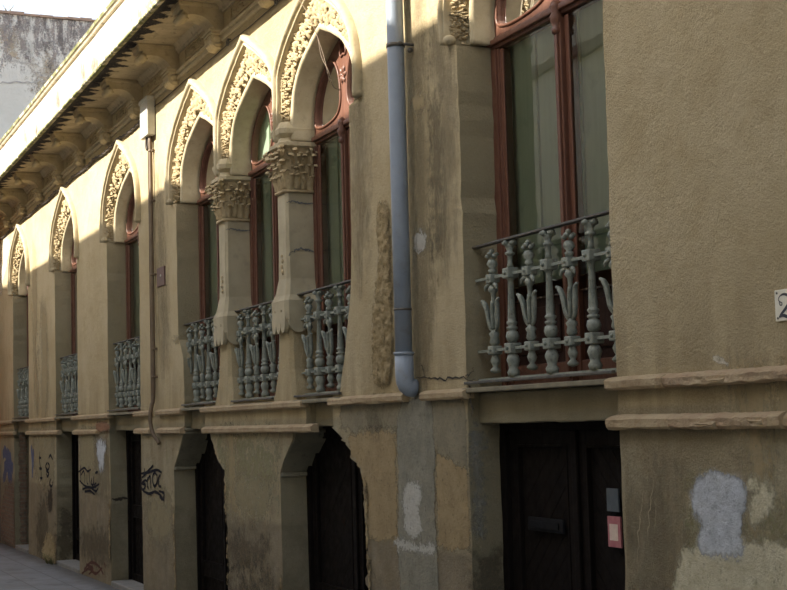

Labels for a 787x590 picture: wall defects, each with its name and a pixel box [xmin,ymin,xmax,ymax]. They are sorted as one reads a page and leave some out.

spalling [361,476,371,590]